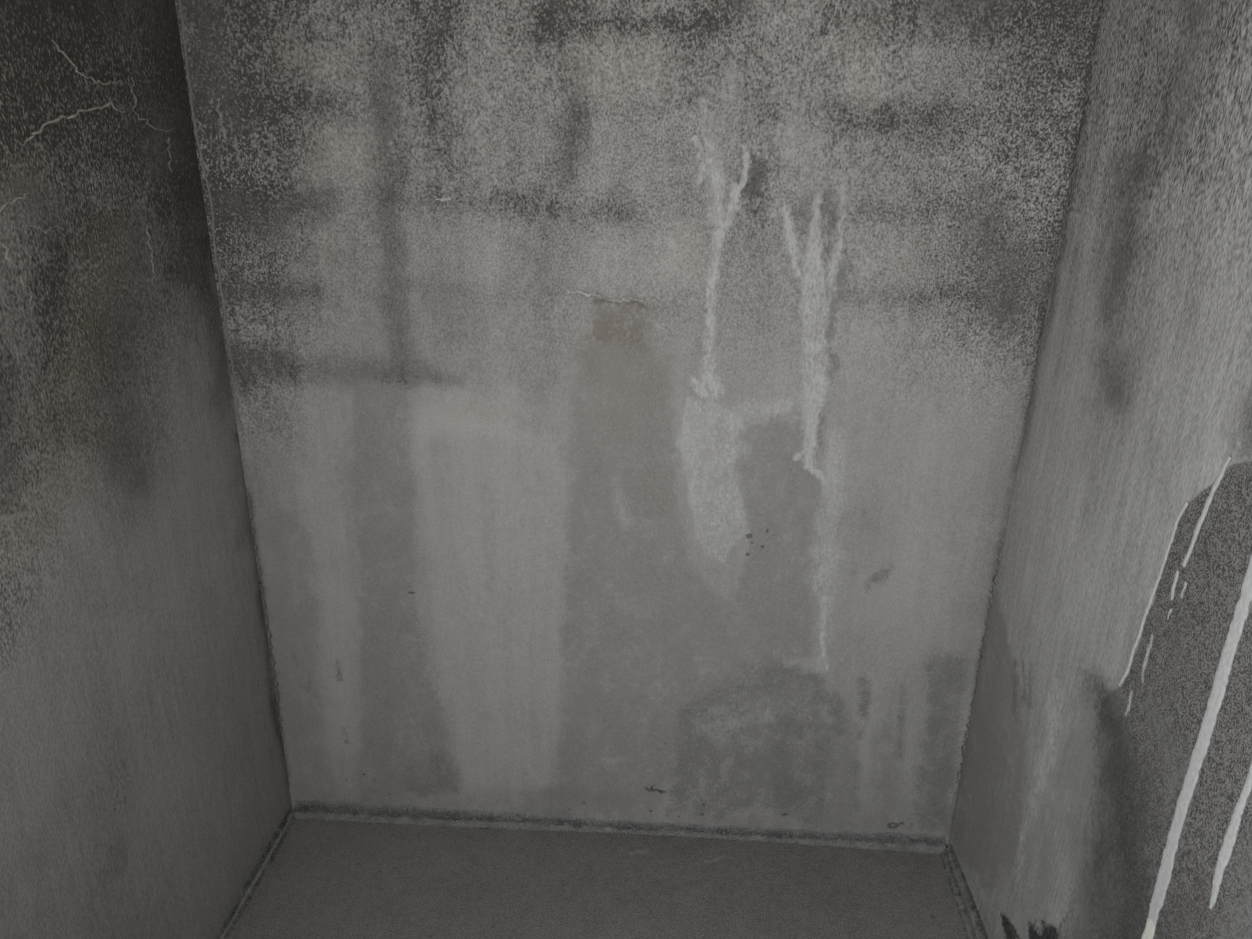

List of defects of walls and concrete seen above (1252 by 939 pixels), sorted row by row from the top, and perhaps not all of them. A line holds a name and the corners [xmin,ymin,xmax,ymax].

crack [27,41,172,169]
crack [146,226,156,282]
damp [551,99,1252,939]